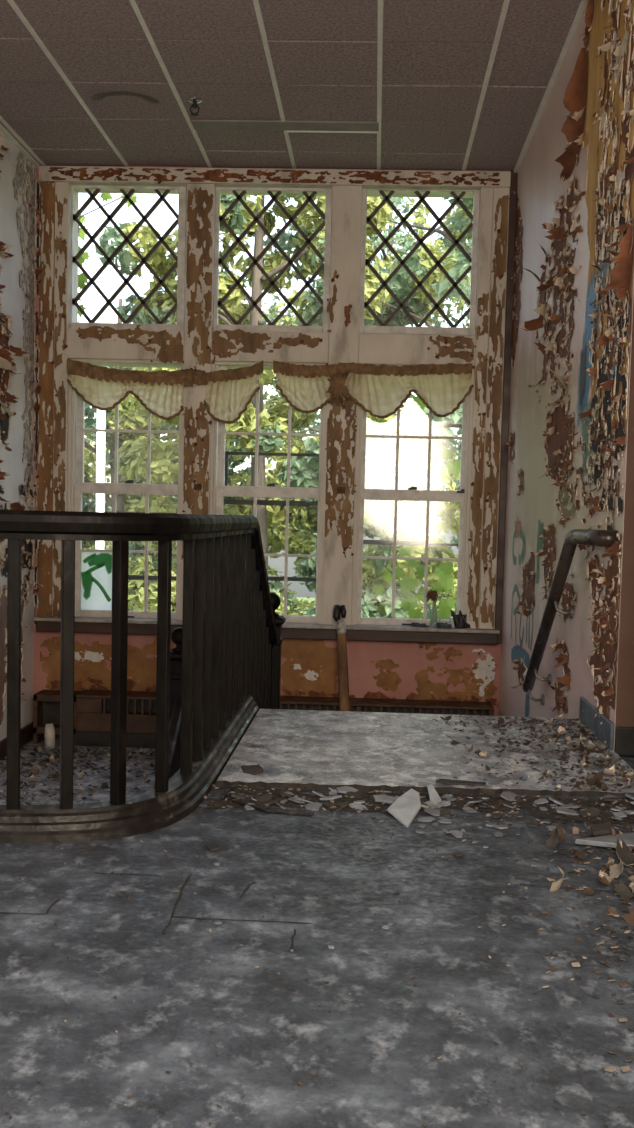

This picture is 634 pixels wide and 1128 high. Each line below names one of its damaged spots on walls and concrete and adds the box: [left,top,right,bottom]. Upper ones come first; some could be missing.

peeling [0,0,634,791]
spalling [373,784,441,828]
crack [101,873,311,950]